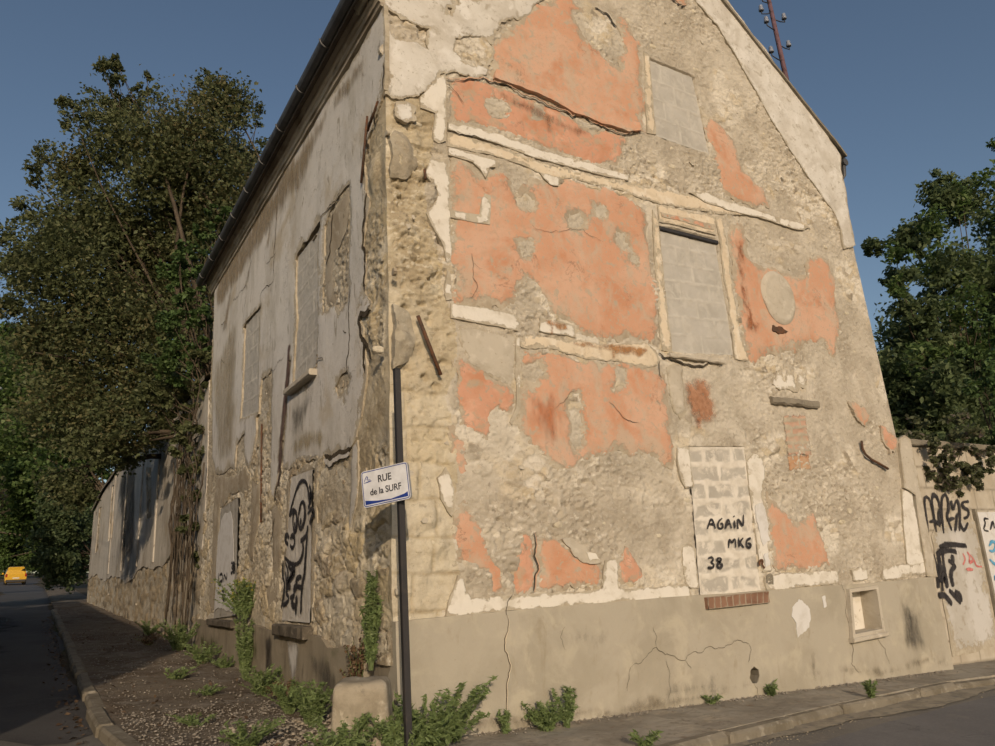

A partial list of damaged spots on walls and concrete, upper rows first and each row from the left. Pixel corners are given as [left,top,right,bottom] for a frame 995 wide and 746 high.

damp [121,469,135,563]
spalling [87,370,291,646]
rust [277,345,290,486]
crack [315,64,384,375]
spalling [311,93,699,638]
crack [504,534,540,714]
crack [627,631,751,698]
spalling [573,0,916,585]